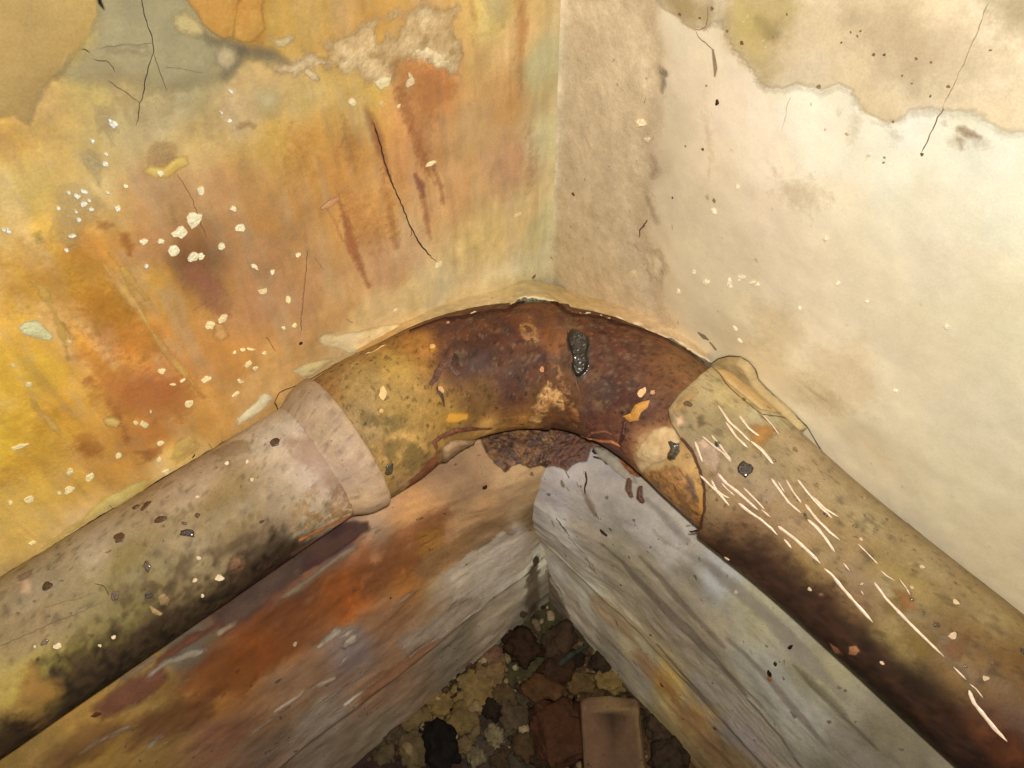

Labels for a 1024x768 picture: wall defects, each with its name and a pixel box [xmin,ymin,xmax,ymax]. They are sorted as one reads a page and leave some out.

crack [81,0,203,124]
peeling [657,0,1024,132]
crack [920,0,990,156]
damp [56,189,96,253]
damp [144,145,188,178]
damp [139,212,205,262]
crack [372,121,436,261]
damp [205,314,228,341]
damp [232,348,267,397]
damp [104,409,152,428]
damp [57,468,75,495]
corrosion [58,514,508,764]